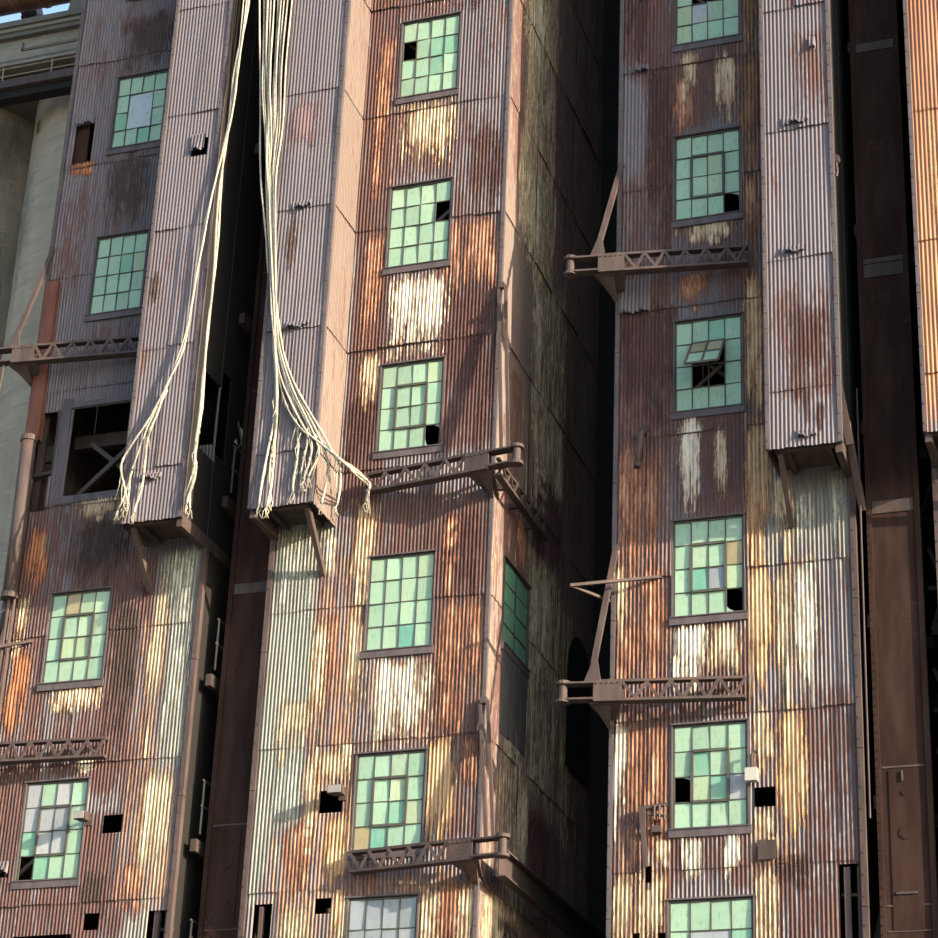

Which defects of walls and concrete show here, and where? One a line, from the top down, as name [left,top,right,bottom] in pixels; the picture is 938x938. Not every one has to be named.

corrosion [69,160,96,179]
corrosion [102,150,151,232]
corrosion [358,225,386,358]
corrosion [3,646,33,739]
corrosion [23,525,49,602]
peeling [275,498,460,938]
corrosion [432,505,489,790]
peeling [668,268,818,938]